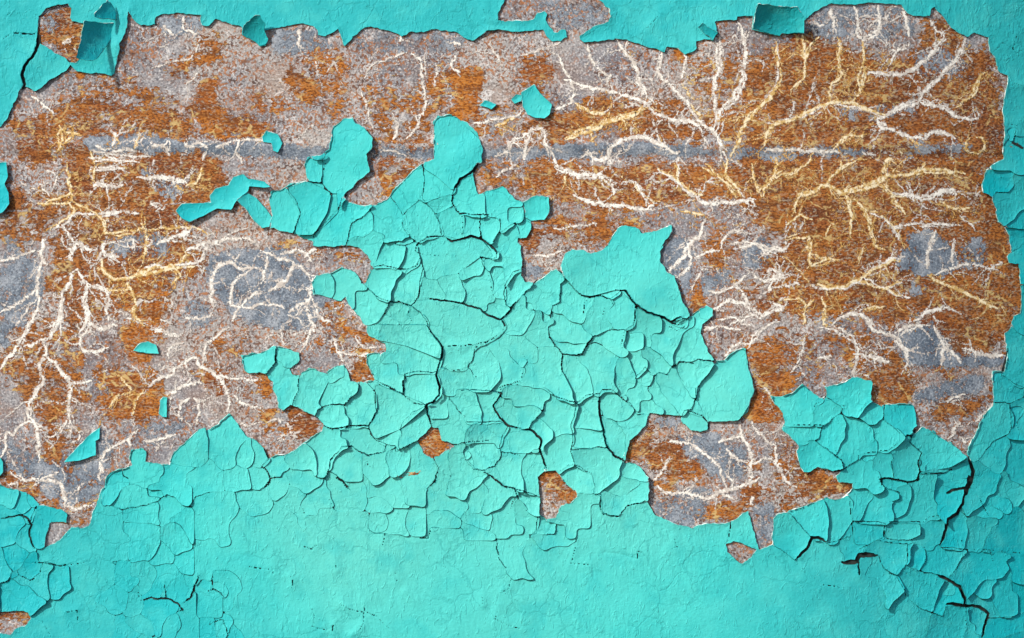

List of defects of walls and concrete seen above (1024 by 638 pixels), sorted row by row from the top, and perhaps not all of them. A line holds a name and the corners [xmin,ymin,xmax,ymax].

peeling [46,4,70,24]
rust [38,5,83,63]
peeling [961,33,1008,116]
water stain [82,129,329,205]
water stain [482,140,884,163]
rust [0,15,1023,523]
water stain [896,227,987,297]
crack [293,163,688,531]
water stain [898,311,1005,404]
crack [794,352,1024,637]
crack [0,506,79,584]
crack [138,576,228,634]